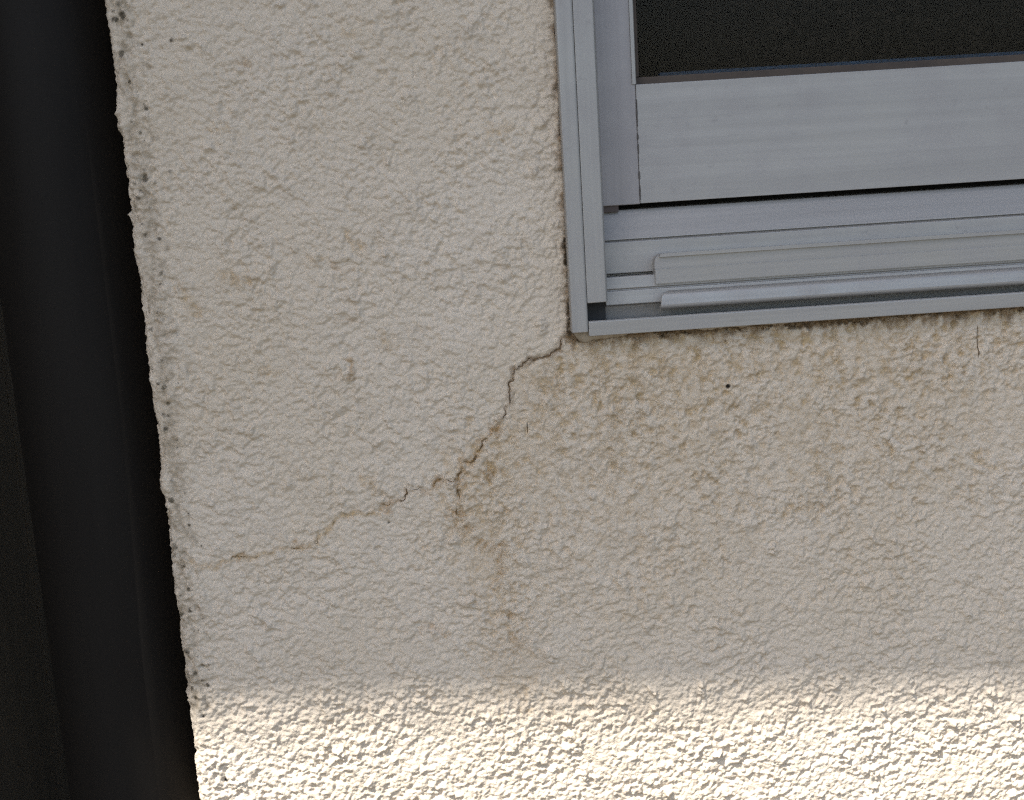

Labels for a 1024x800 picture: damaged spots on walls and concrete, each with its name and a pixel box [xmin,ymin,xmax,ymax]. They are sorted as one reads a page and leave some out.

crack [367,336,566,515]